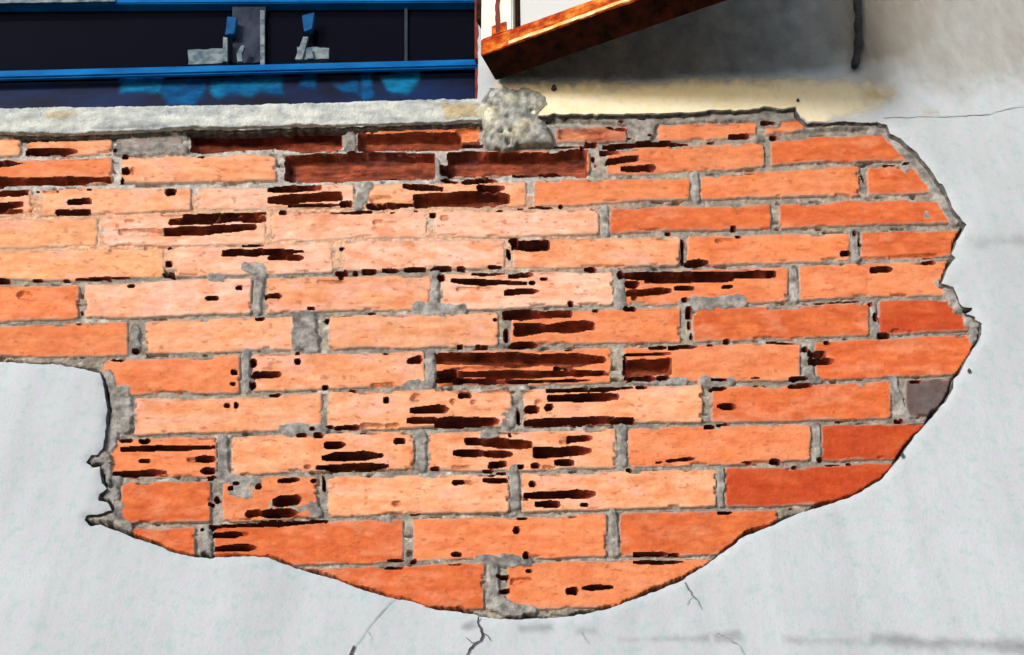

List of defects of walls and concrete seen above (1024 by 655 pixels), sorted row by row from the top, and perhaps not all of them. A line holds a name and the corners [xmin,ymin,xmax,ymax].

flaking render [0,98,982,620]
crack [466,616,490,655]